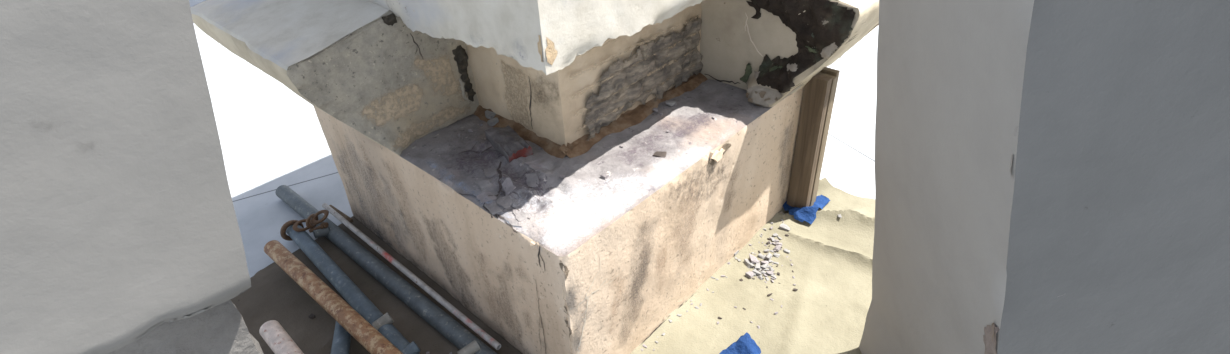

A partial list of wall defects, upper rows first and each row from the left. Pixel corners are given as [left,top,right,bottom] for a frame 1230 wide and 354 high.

spalling [537,35,558,65]
spalling [570,17,703,141]
peeling [740,0,865,108]
leakage [624,107,732,165]
peeling [474,159,548,228]
spalling [983,323,1000,354]